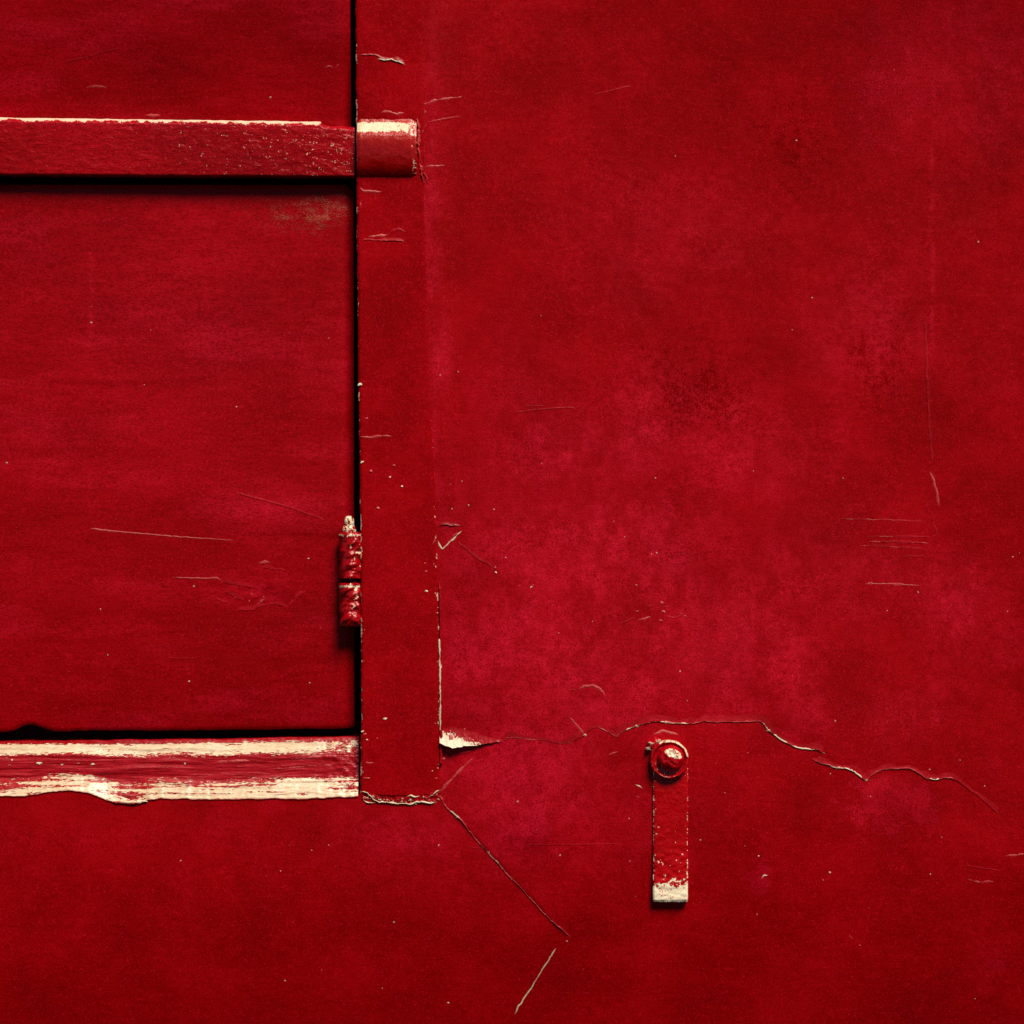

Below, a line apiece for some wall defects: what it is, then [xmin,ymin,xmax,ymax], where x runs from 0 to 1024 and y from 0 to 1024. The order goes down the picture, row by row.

peeling [0,723,503,806]
crack [438,583,570,1013]
crack [502,714,999,814]